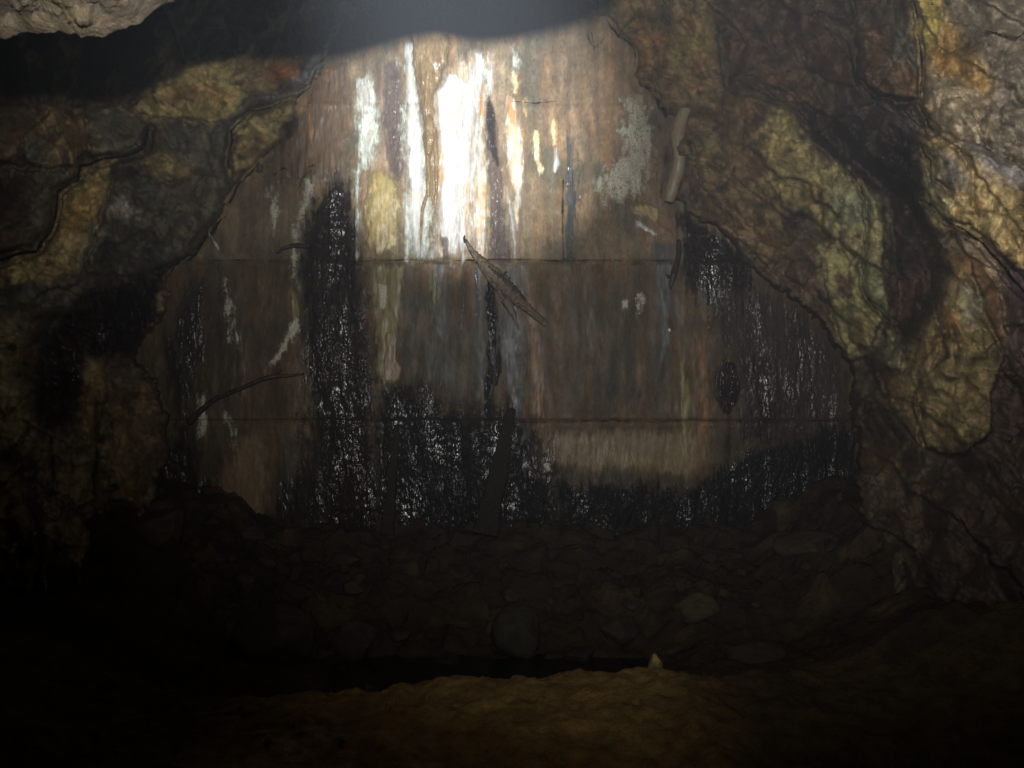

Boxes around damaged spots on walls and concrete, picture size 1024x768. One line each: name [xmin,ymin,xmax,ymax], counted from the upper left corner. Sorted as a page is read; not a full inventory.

water stain [158,283,210,493]
water stain [264,42,857,536]